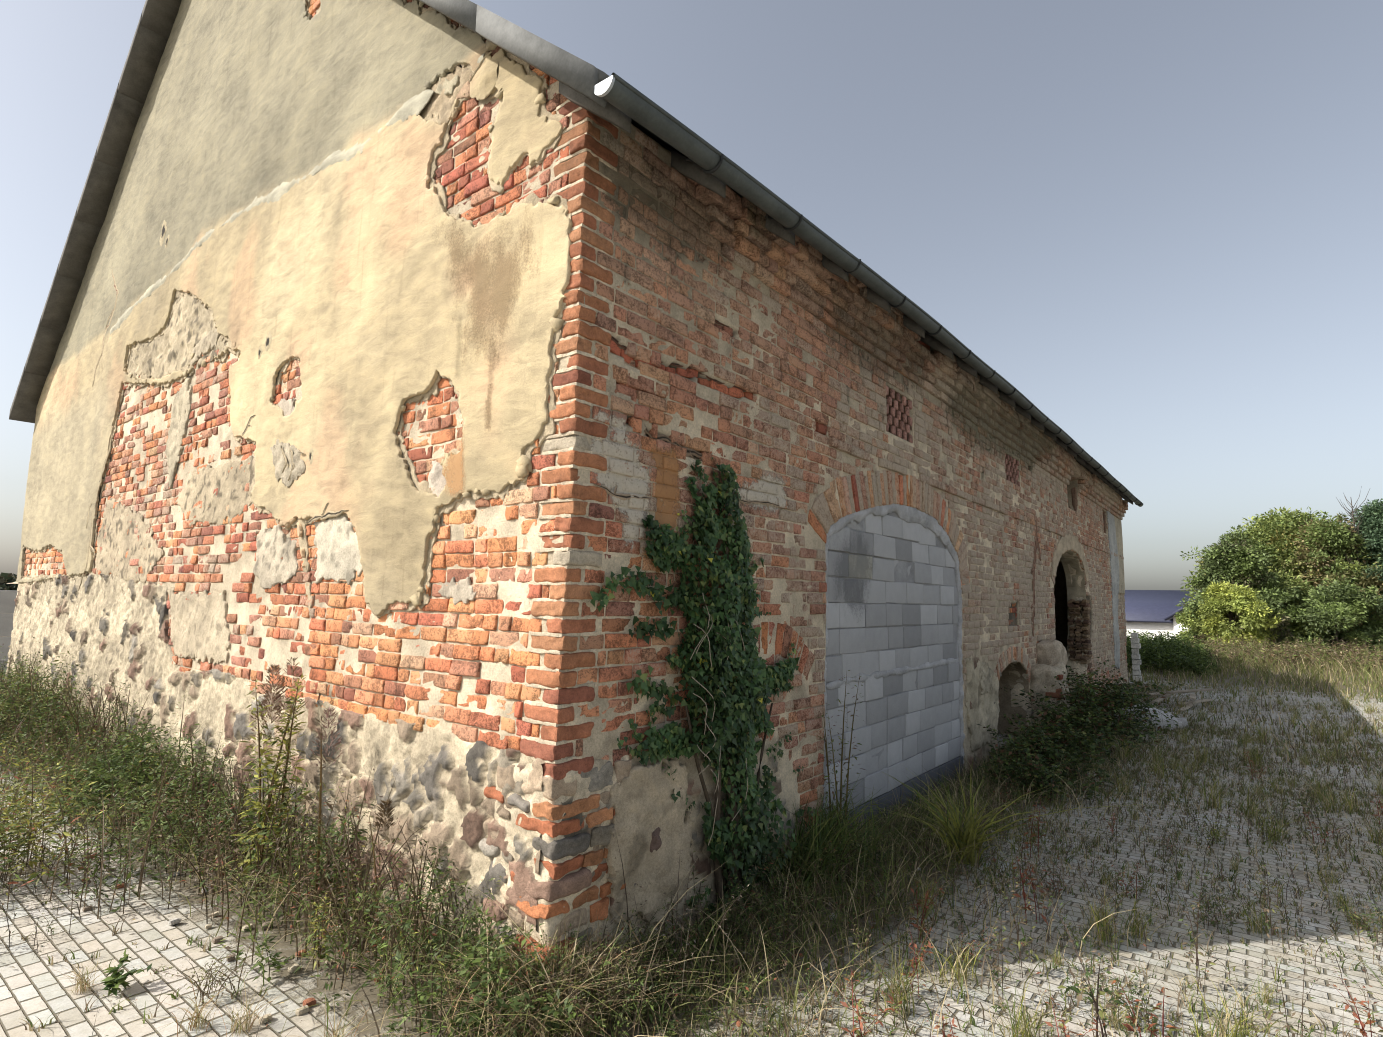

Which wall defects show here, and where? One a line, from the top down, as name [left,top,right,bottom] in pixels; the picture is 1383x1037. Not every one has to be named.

spalling [303,0,321,20]
spalling [485,39,501,57]
spalling [423,65,573,227]
damp [450,228,529,350]
spalling [7,547,67,584]
spalling [84,293,565,764]